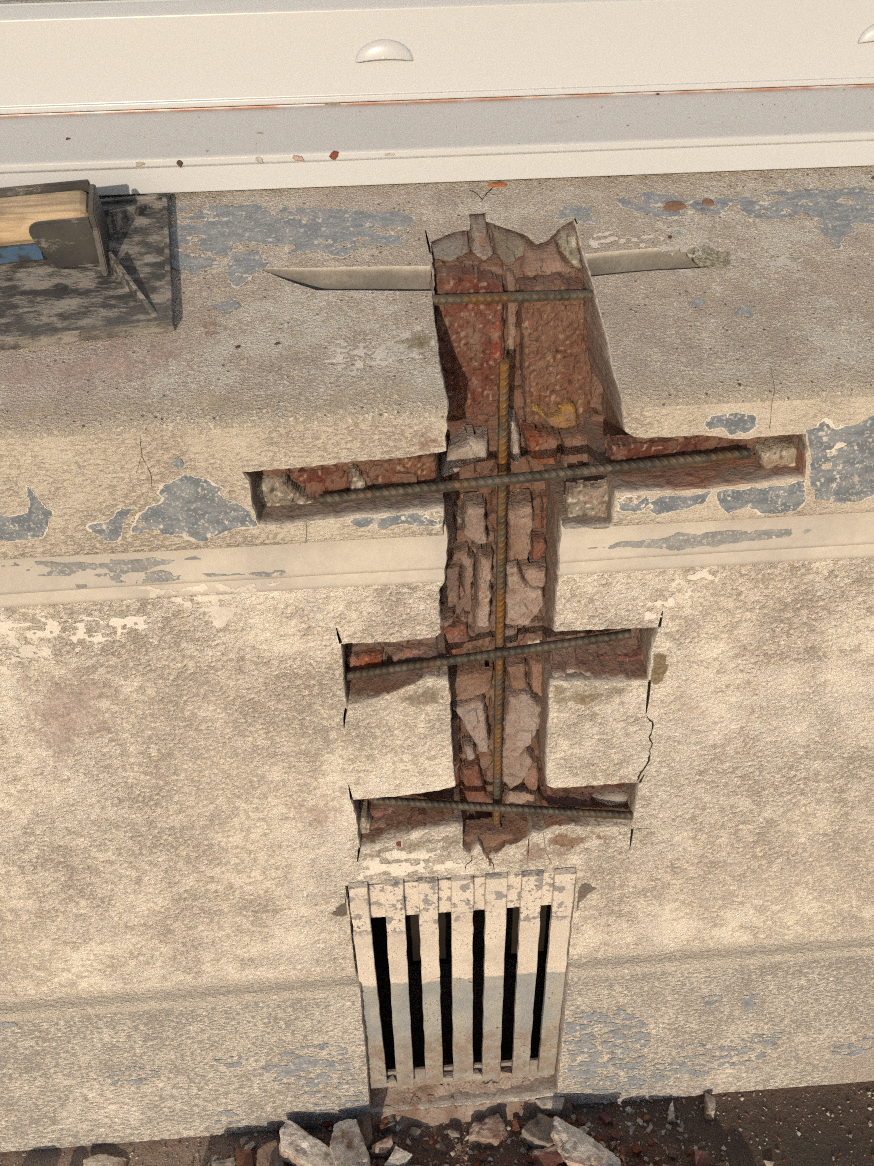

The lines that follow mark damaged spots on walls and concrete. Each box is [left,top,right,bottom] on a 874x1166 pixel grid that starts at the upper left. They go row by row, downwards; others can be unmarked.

peeling [0,485,55,542]
spalling [86,176,874,879]
peeling [1,557,285,633]
crack [638,715,654,779]
spalling [371,917,389,969]
spalling [405,914,421,966]
spalling [438,912,452,964]
spalling [473,910,485,962]
spalling [504,907,520,959]
spalling [538,905,551,957]